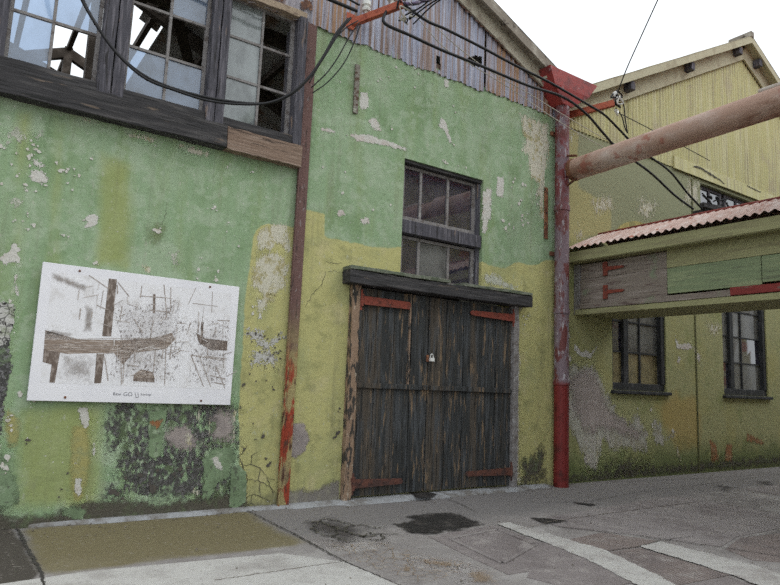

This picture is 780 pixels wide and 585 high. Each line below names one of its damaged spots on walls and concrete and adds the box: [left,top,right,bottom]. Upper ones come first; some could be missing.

peeling [359,92,369,110]
peeling [347,117,406,151]
peeling [481,113,550,234]
peeling [242,223,291,391]
leakage [0,453,20,513]
leakage [0,301,23,435]
leakage [104,402,241,501]
crack [235,446,275,506]
peeling [569,334,674,473]